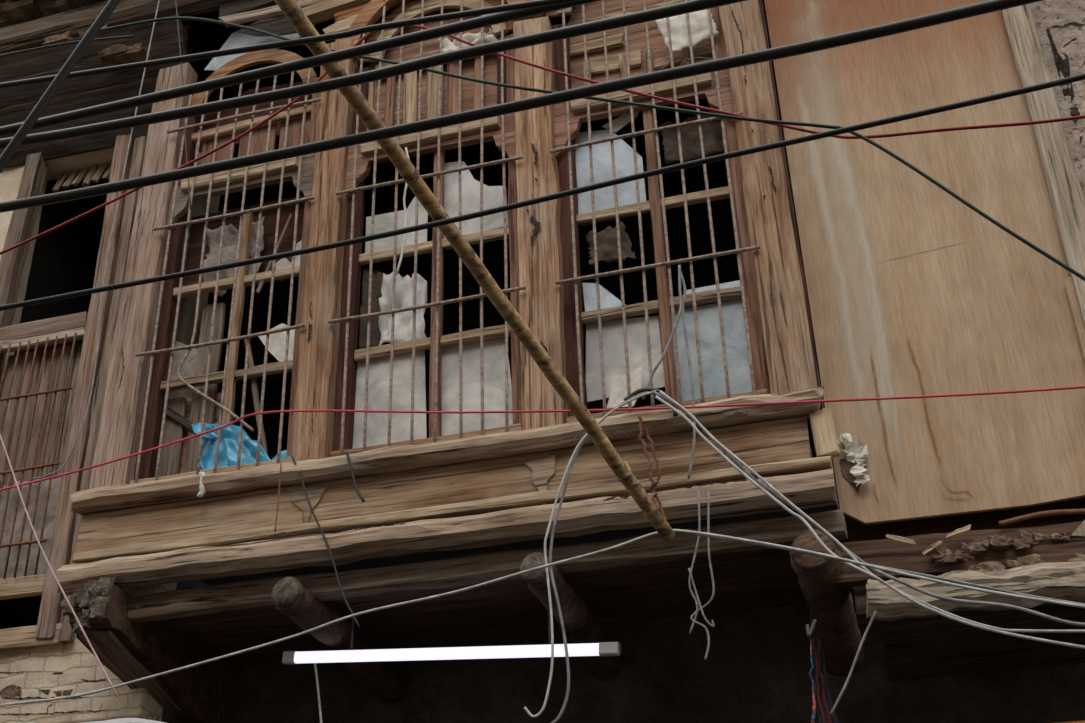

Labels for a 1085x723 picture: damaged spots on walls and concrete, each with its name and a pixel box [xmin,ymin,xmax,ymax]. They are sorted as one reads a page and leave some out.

crack [1048,22,1085,67]